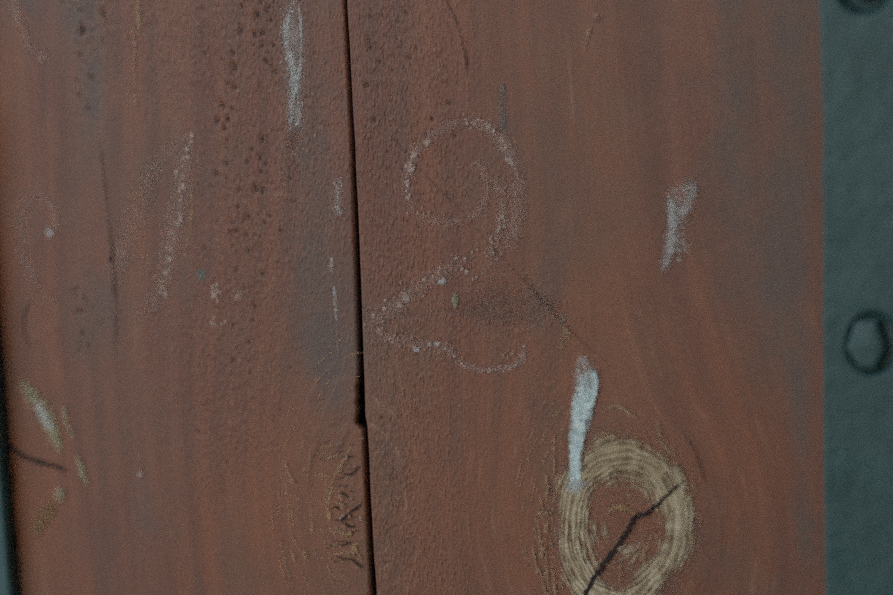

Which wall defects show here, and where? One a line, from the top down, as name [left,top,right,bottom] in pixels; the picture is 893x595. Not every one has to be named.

crack [583,438,704,595]